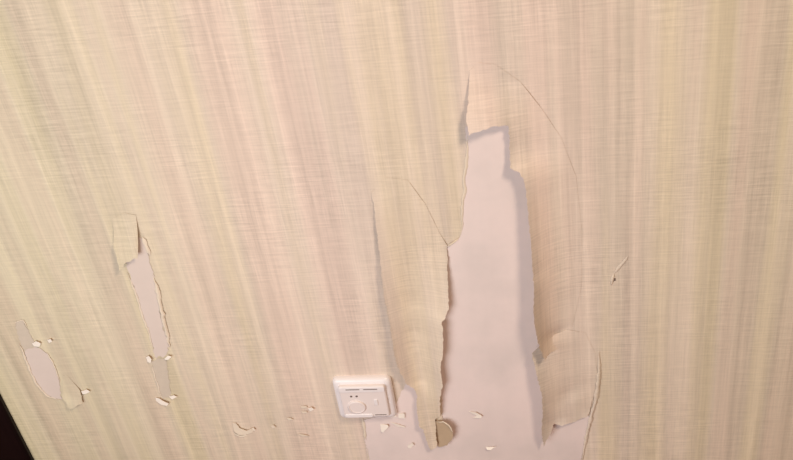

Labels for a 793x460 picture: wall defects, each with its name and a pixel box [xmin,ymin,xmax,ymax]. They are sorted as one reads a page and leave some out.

flaking render [25,339,62,400]
flaking render [364,63,589,460]